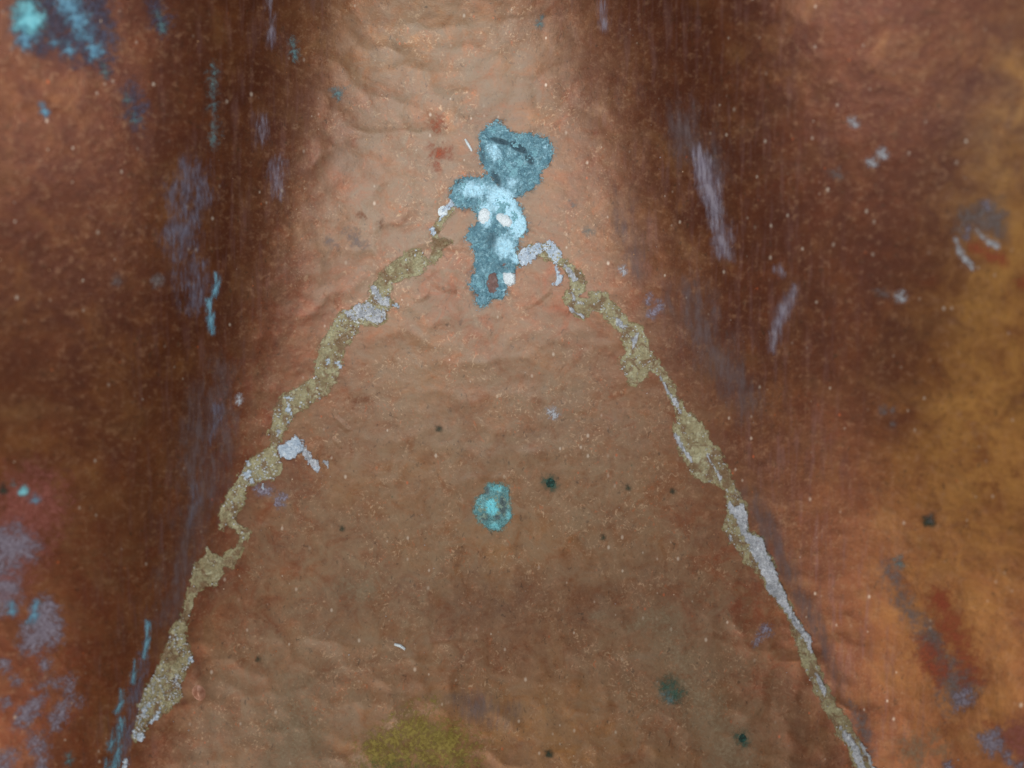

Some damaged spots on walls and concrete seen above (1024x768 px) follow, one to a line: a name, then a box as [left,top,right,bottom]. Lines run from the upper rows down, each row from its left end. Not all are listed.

damp [486,263,506,293]